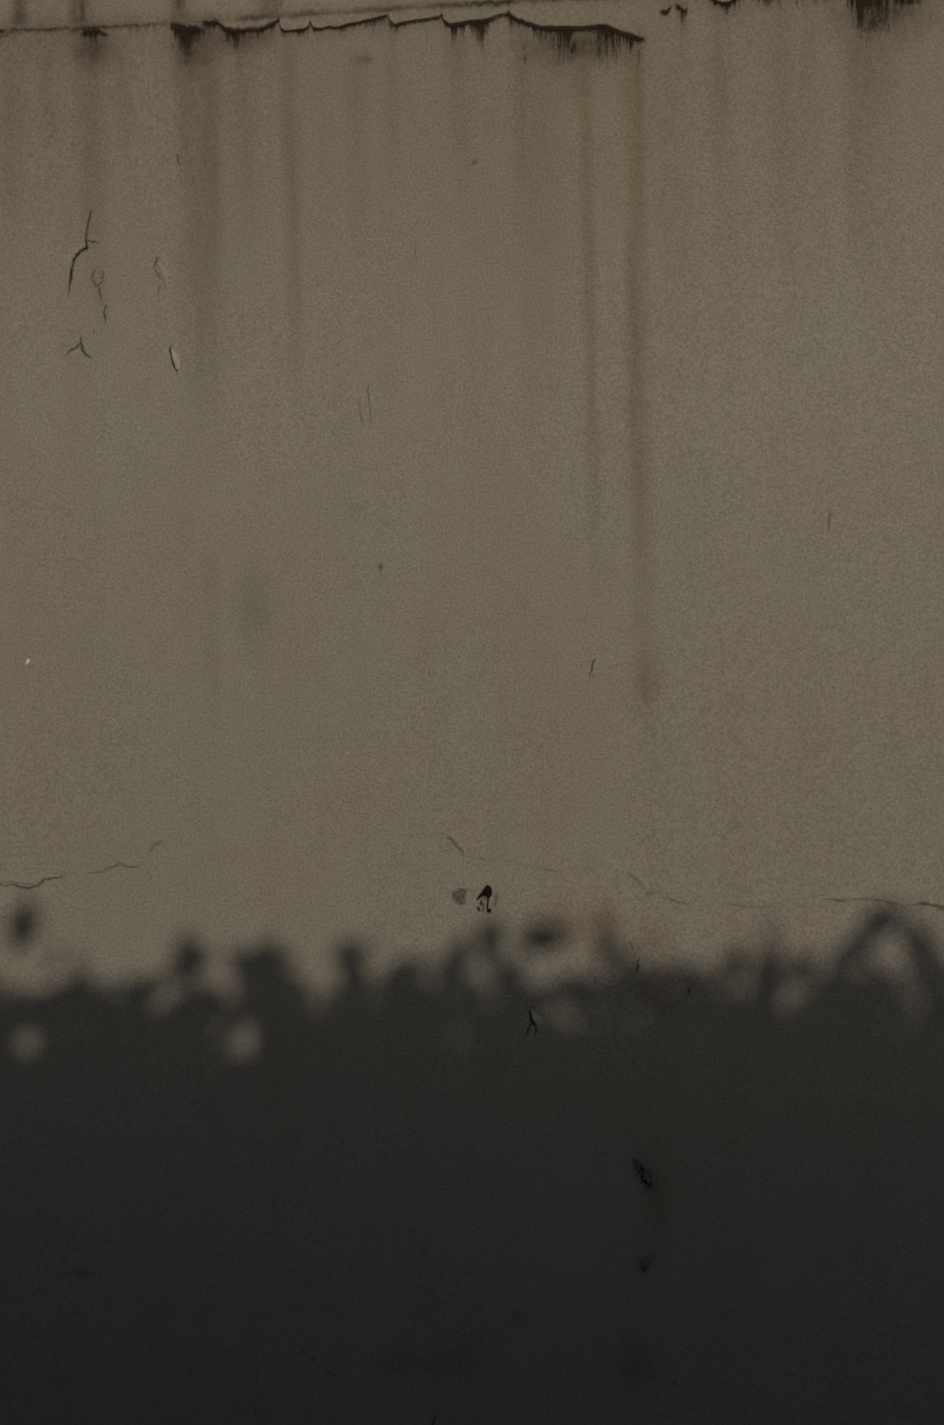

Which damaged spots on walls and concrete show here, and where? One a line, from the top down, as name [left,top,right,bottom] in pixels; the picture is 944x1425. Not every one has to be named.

flaking render [204,0,647,39]
leakage [850,0,919,27]
crack [65,216,95,286]